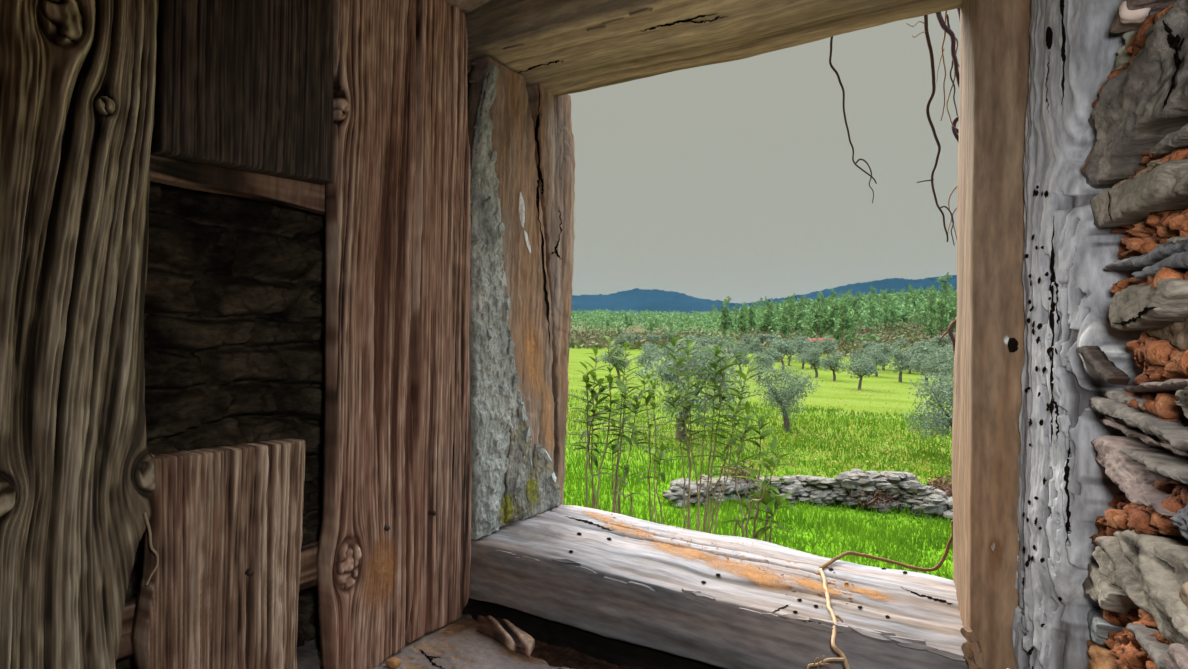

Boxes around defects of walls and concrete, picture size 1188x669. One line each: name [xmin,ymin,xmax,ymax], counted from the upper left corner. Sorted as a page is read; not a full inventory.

crack [519,60,565,347]
crack [1162,20,1185,109]